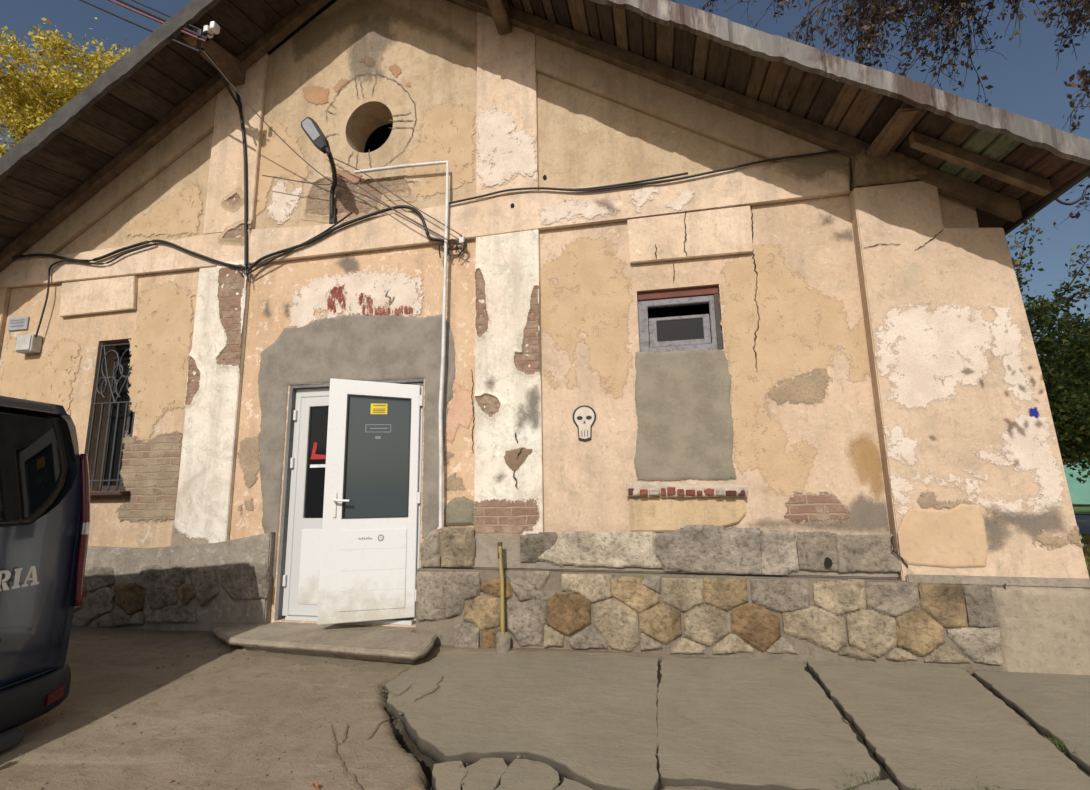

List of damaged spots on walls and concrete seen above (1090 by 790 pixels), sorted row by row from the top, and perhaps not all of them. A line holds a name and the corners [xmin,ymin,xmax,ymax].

peeling [217,102,537,246]
peeling [289,270,427,328]
spalling [475,262,495,344]
crack [751,206,760,369]
peeling [116,260,249,523]
peeling [719,244,1065,525]
spalling [237,432,260,515]
peeling [443,381,522,491]
spalling [498,447,532,479]
flaking render [474,498,540,536]
spalling [1032,526,1084,550]